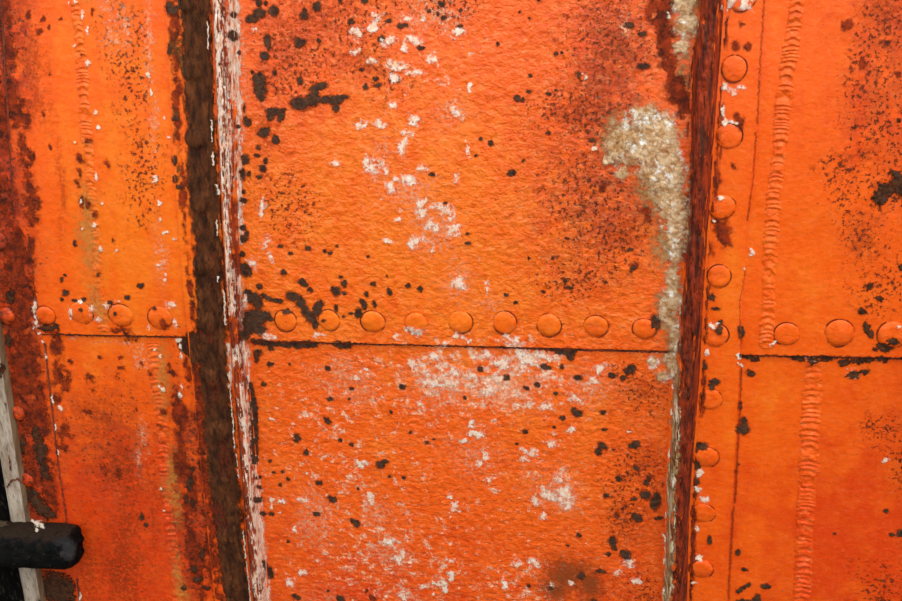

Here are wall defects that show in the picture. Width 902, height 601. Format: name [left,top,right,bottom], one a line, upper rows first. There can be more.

peeling [356,119,386,129]
peeling [362,115,471,253]
rust [0,0,265,601]
peeling [207,0,377,601]
peeling [447,267,469,296]
rust [250,0,752,601]
damp [602,105,690,601]
peeling [736,353,760,377]
peeling [791,307,902,379]
peeling [357,487,383,522]
peeling [355,459,391,478]
peeling [378,537,407,566]